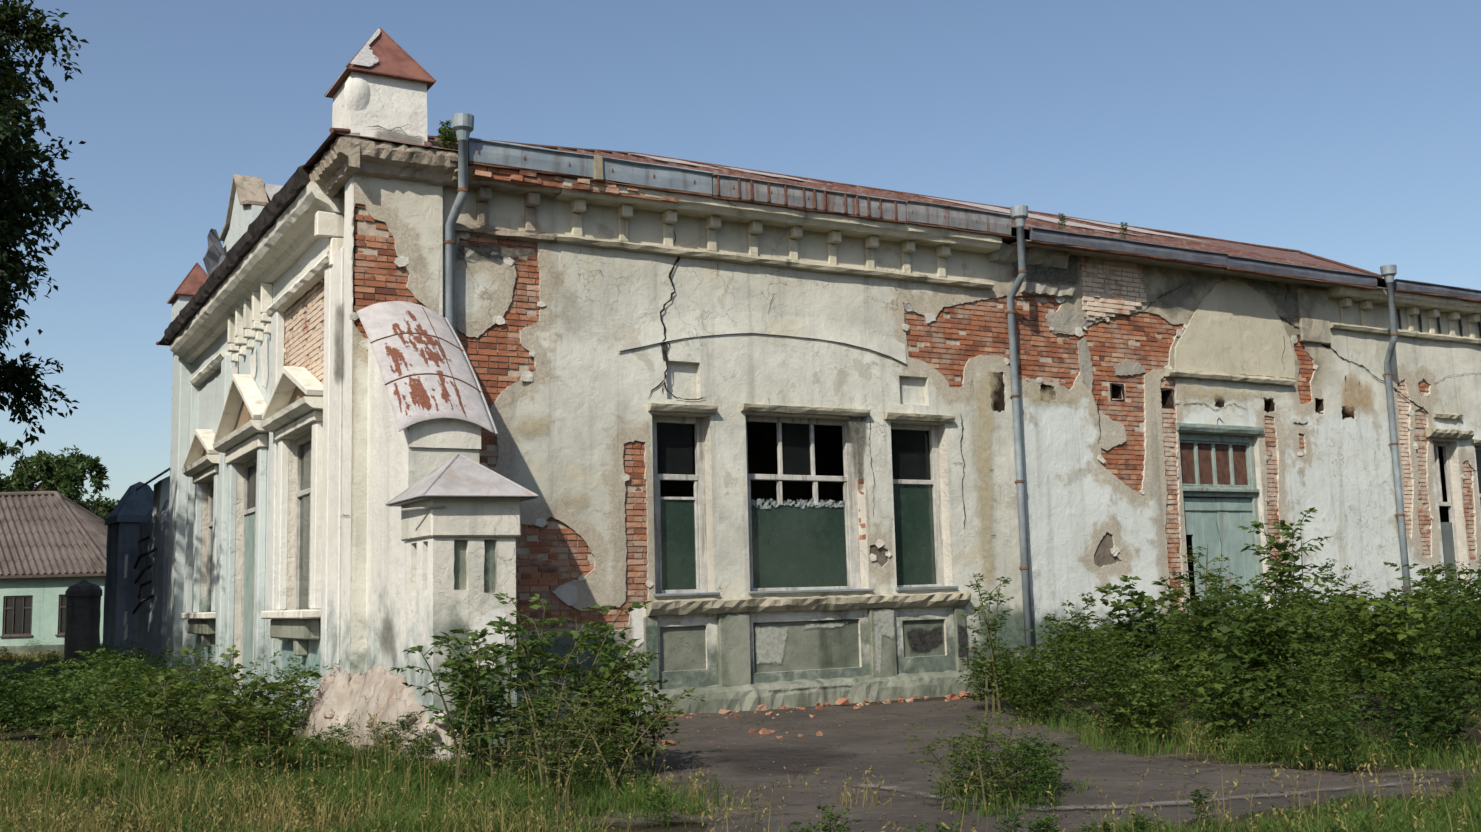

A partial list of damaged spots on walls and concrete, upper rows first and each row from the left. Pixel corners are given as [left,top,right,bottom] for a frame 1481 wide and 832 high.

flaking render [284,278,324,384]
flaking render [349,204,425,350]
corrosion [385,310,466,416]
flaking render [457,232,546,468]
crack [648,232,703,400]
flaking render [902,256,1188,610]
crack [1279,283,1481,413]
flaking render [469,441,654,670]